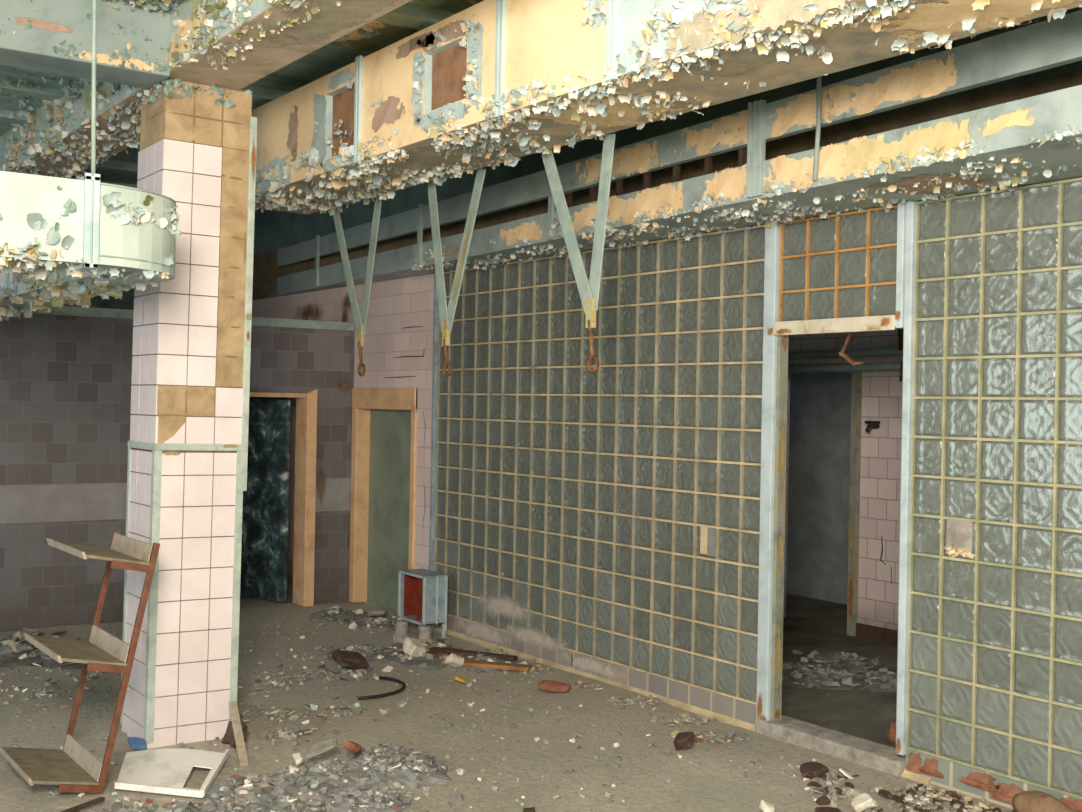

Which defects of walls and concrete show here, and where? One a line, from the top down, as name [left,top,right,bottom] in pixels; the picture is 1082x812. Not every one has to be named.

peeling [0,0,1082,443]
leakage [458,597,615,679]
spalling [906,752,944,779]
spalling [958,772,1025,804]